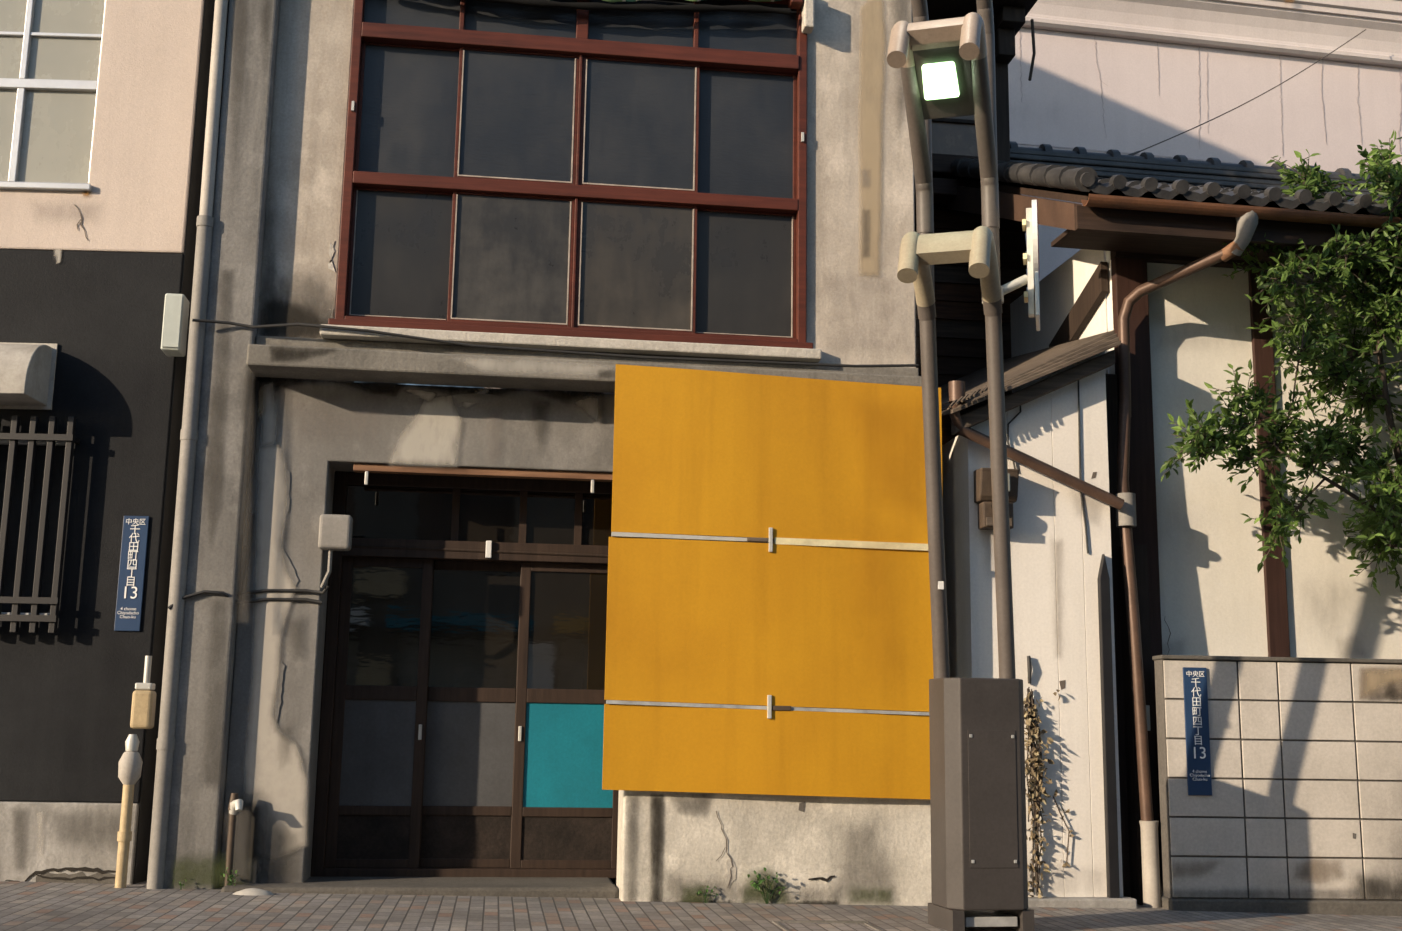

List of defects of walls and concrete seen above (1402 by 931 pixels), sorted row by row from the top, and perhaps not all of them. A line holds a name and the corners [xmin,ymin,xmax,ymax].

crack [1094,35,1108,134]
crack [1198,46,1209,147]
crack [1277,55,1285,156]
crack [1320,59,1328,144]
crack [1355,64,1363,144]
crack [1394,68,1402,157]
damp [240,369,317,619]
peeling [245,384,306,853]
damp [1361,669,1402,698]
crack [716,811,733,888]